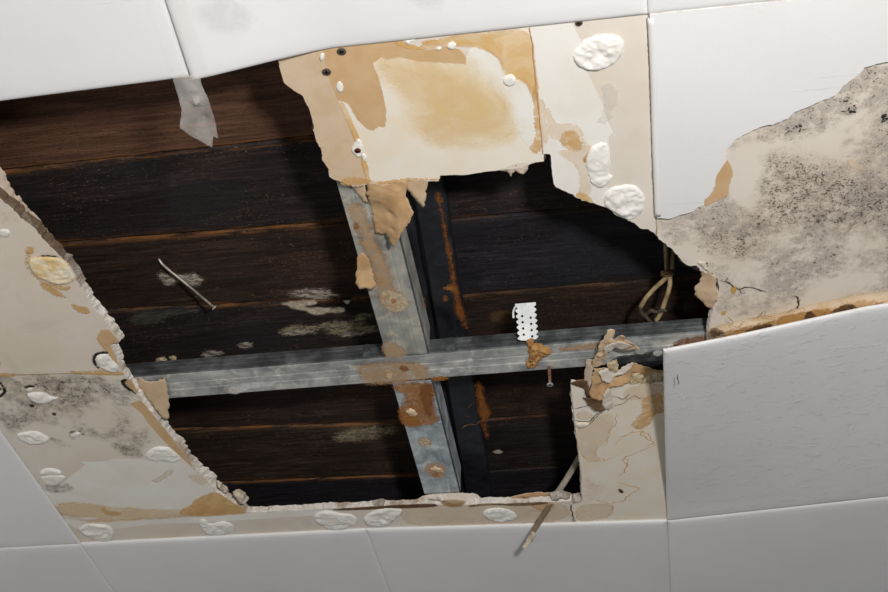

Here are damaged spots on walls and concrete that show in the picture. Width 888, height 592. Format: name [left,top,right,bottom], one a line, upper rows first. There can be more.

leakage [346,115,359,141]
leakage [341,156,437,186]
peeling [339,23,613,206]
leakage [383,33,590,168]
leakage [576,179,591,202]
leakage [665,67,888,337]
leakage [25,247,89,314]
rust [435,192,466,327]
leakage [0,351,148,457]
peeling [43,457,437,529]
rust [462,381,491,437]
peeling [469,381,666,522]